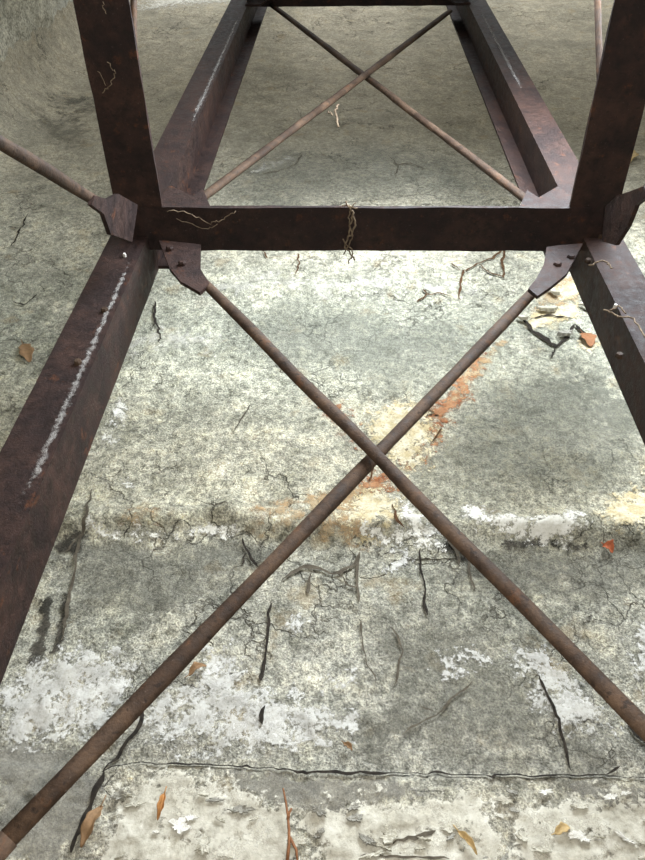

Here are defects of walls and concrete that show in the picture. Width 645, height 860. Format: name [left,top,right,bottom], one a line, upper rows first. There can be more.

rust [535,278,578,310]
crack [523,314,586,357]
rust [398,340,508,470]
leakage [359,494,447,572]
leakage [461,460,645,549]
crack [258,601,272,681]
crack [70,675,645,853]
crack [359,830,449,859]